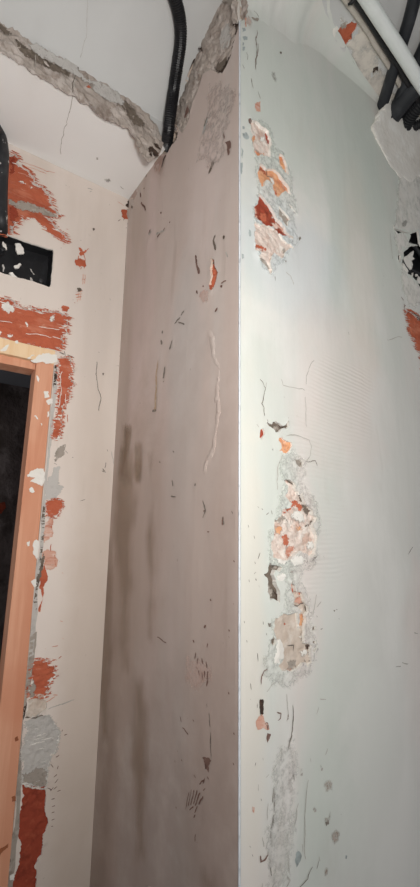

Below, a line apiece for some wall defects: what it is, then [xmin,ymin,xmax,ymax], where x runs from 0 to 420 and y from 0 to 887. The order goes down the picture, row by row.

spalling [0,24,70,77]
crack [60,0,88,153]
spalling [121,101,145,127]
flaking render [214,0,259,74]
flaking render [0,150,73,244]
flaking render [241,102,301,284]
flaking render [0,296,75,441]
flaking render [403,309,420,369]
flaking render [38,498,65,612]
flaking render [260,420,321,687]
flaking render [26,656,62,699]
flaking render [13,784,48,887]